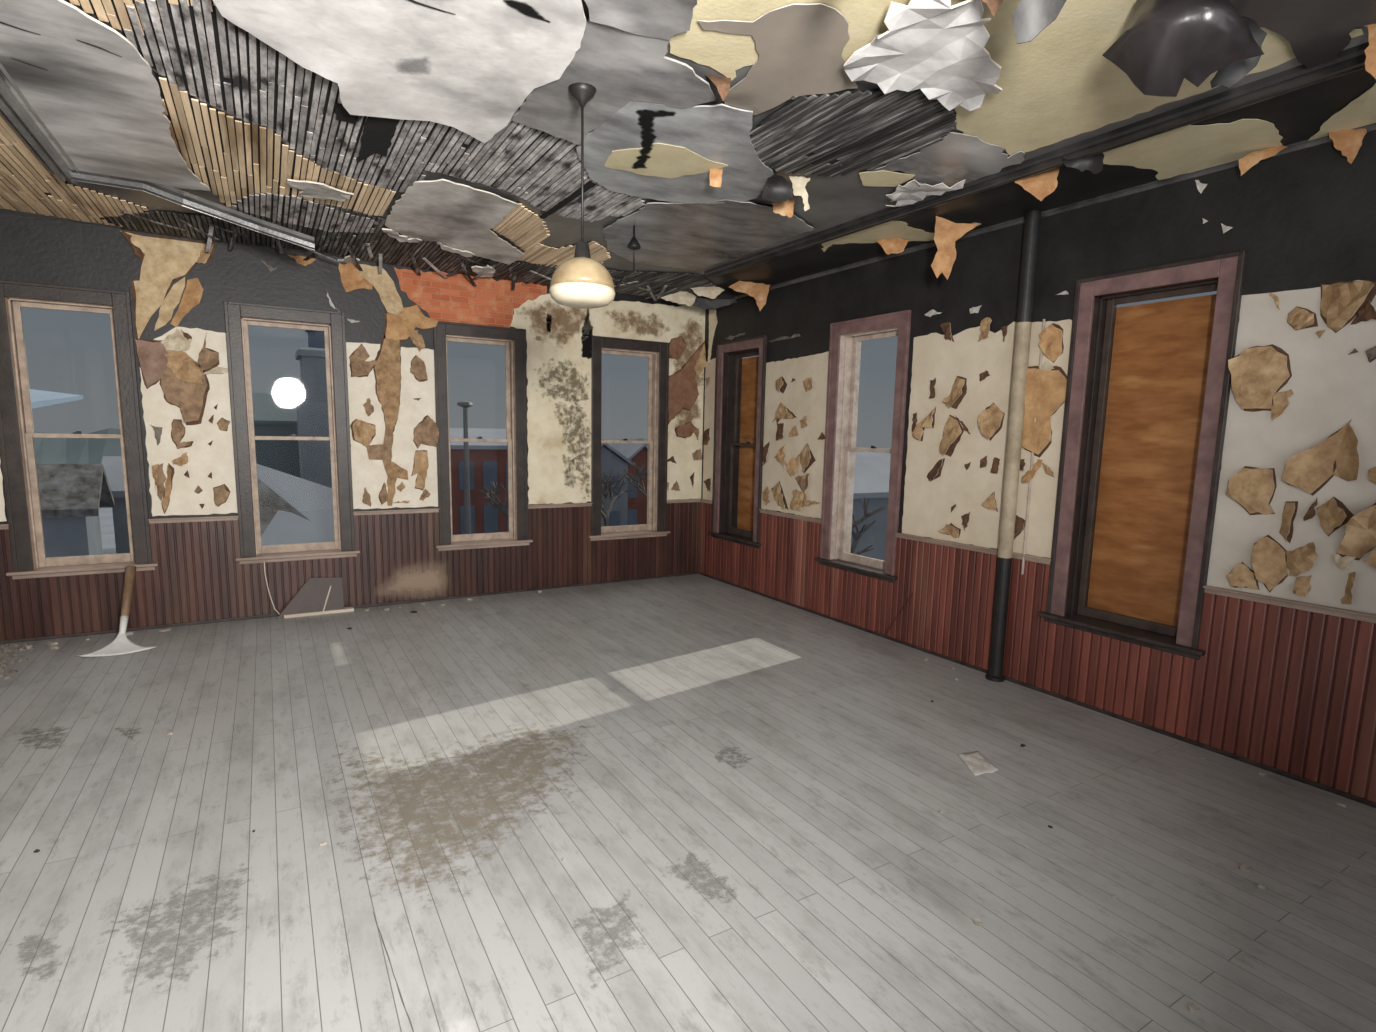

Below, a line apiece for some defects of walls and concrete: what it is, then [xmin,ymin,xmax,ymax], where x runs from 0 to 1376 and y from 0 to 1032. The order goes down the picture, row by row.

spalling [335,103,400,163]
peeling [604,143,728,187]
peeling [762,174,810,218]
peeling [669,0,910,101]
peeling [821,216,981,280]
peeling [951,0,1296,201]
peeling [1308,23,1376,164]
peeling [121,230,230,512]
flaking render [326,263,770,507]
water stain [539,362,590,496]
peeling [912,370,1004,481]
peeling [1226,422,1376,605]